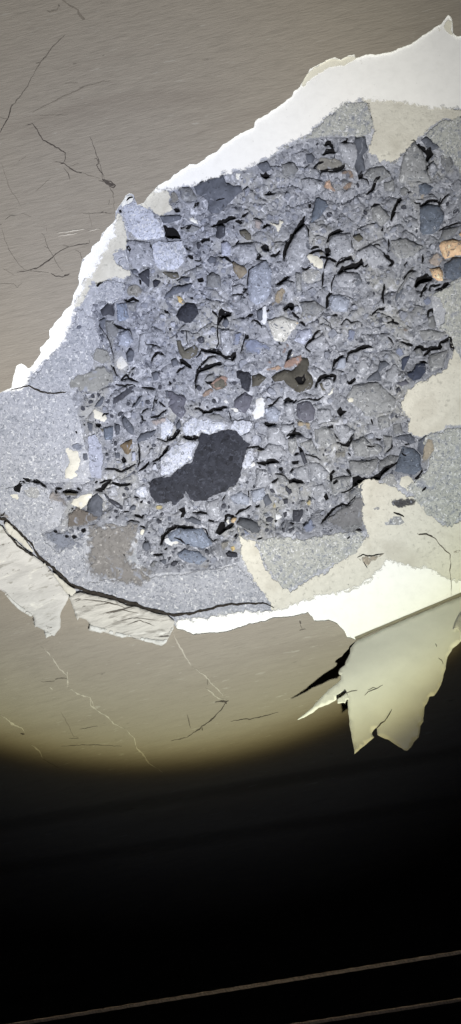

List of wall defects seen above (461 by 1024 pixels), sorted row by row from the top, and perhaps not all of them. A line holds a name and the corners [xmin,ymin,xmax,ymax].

crack [0,0,116,288]
spalling [0,16,461,646]
crack [39,645,163,773]
crack [0,513,272,700]